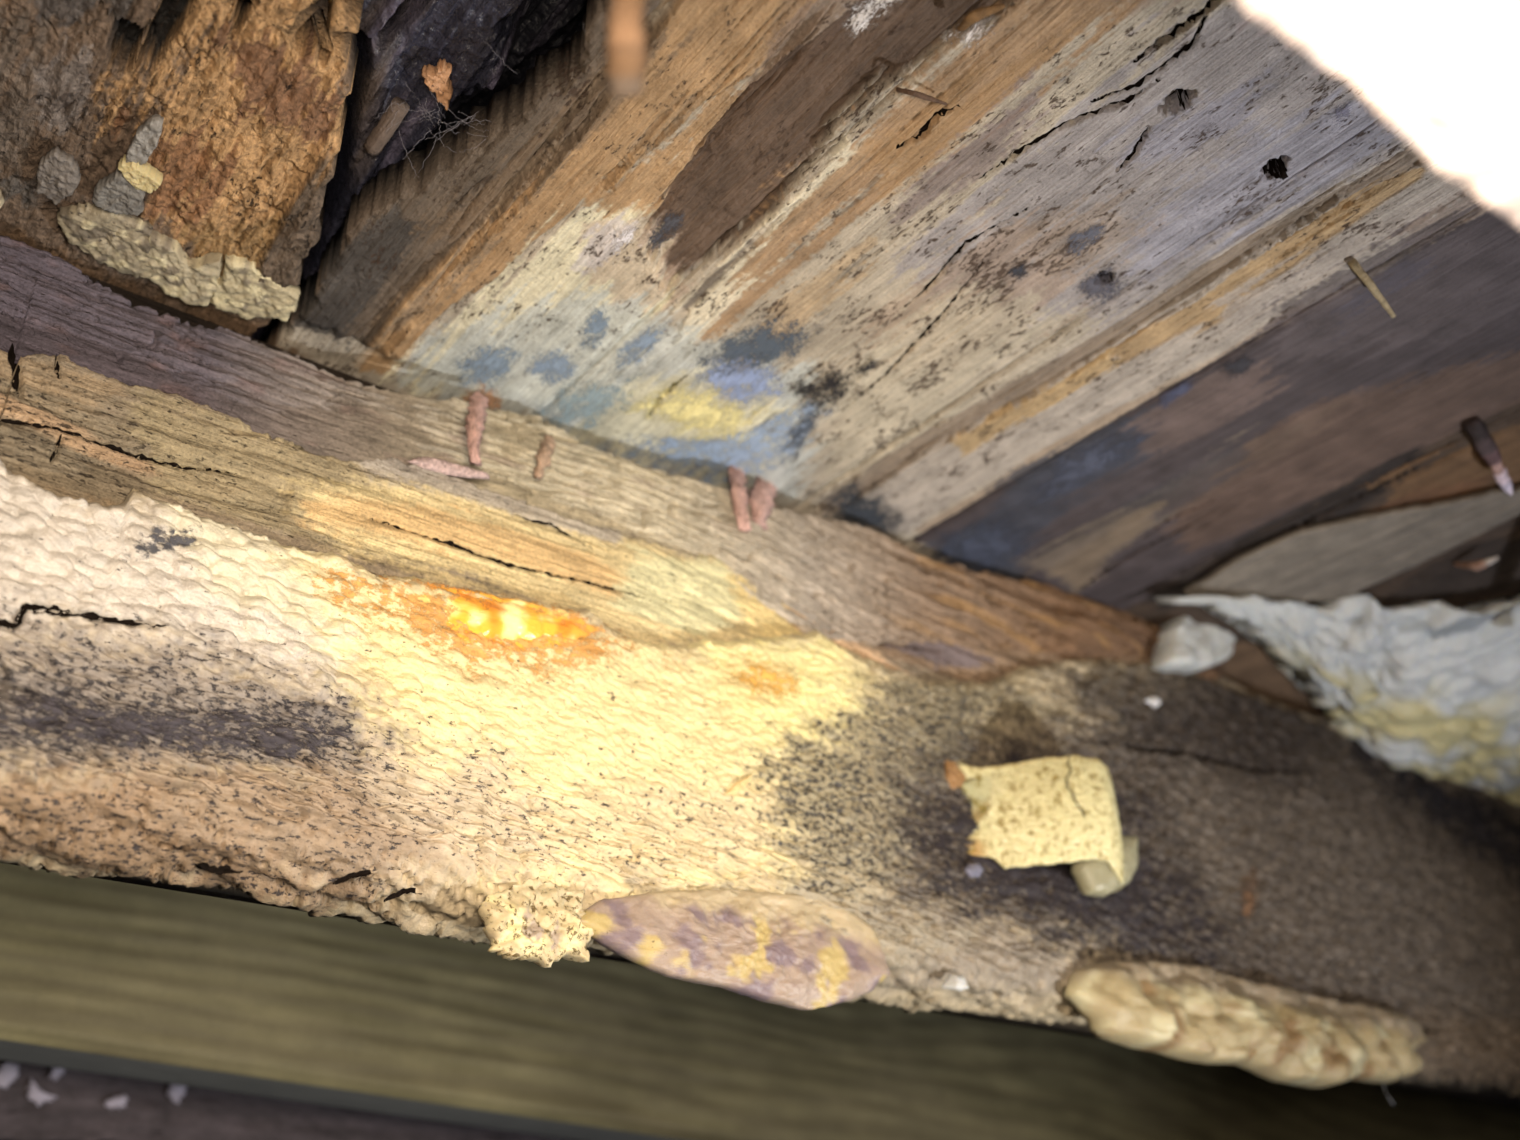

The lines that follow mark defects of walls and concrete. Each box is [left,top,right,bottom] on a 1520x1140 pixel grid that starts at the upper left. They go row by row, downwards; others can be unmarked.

crack [978,0,1211,179]
crack [0,603,166,630]
peeling [953,755,1138,897]